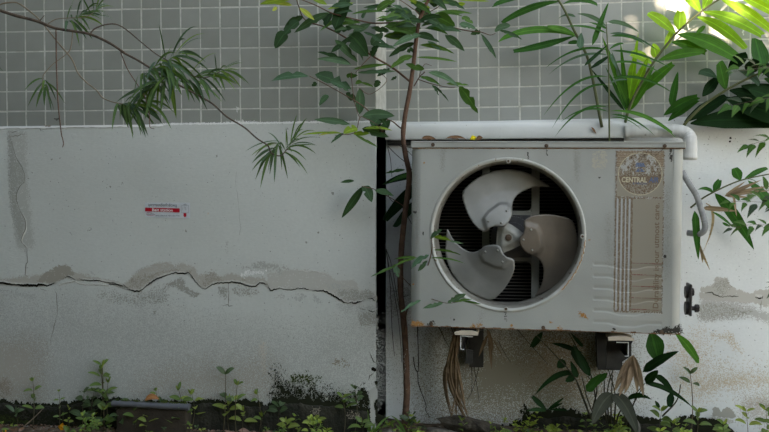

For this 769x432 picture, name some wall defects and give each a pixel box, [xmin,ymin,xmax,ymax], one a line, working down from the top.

crack [0,131,375,343]
spalling [0,261,378,306]
damp [0,266,412,428]
crack [707,292,763,315]